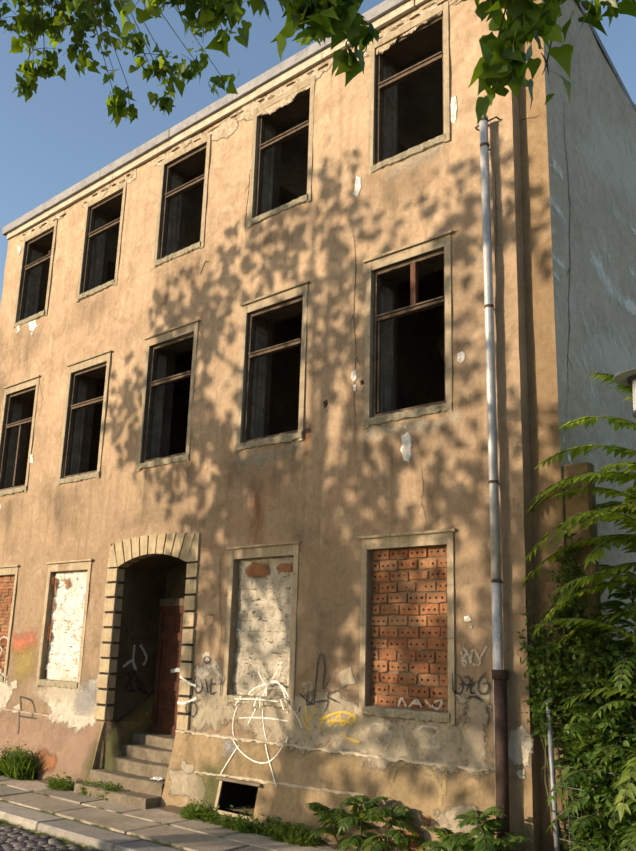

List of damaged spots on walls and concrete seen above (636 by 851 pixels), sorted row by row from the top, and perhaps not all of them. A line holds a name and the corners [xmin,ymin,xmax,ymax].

flaking render [154,56,333,166]
crack [350,231,360,427]
flaking render [186,652,495,781]
flaking render [508,725,534,779]